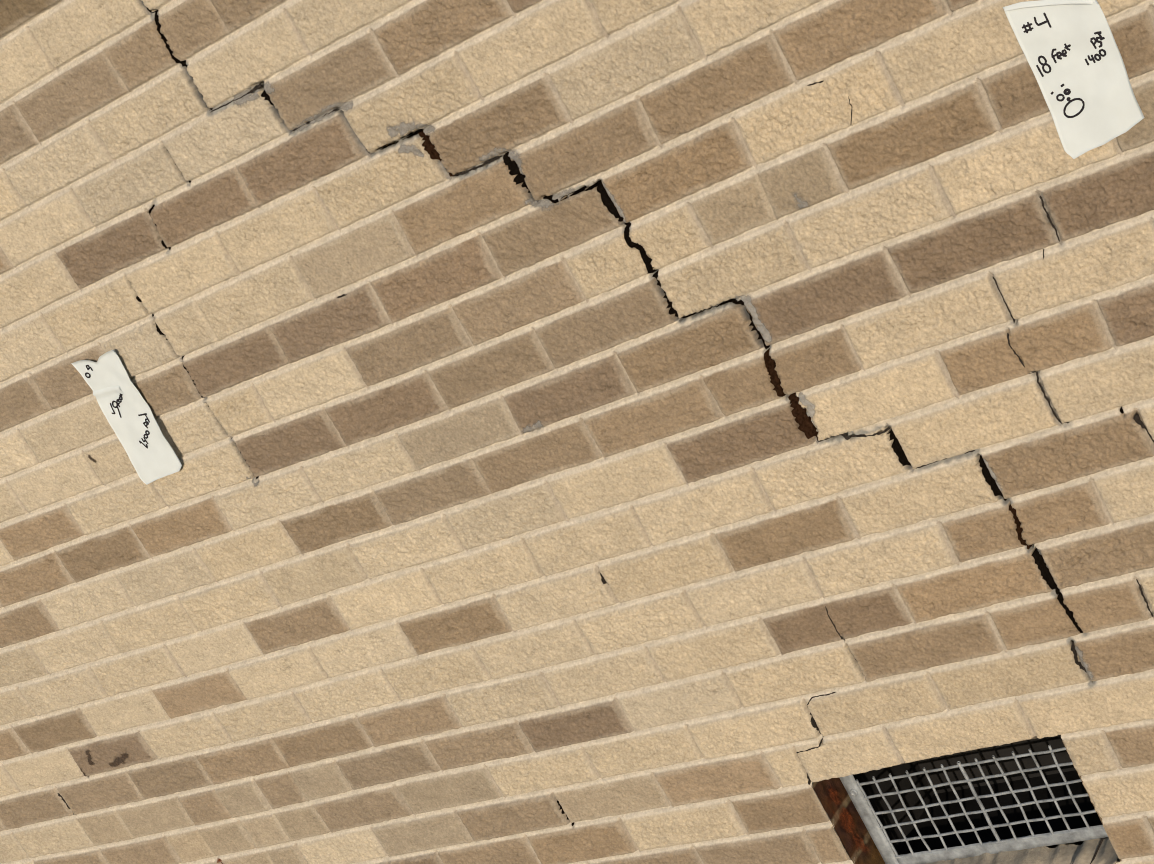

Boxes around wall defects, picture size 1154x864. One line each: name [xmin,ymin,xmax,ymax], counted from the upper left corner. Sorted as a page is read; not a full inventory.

crack [147,8,274,112]
crack [149,205,171,250]
crack [136,296,209,407]
crack [366,129,1086,672]
crack [1120,407,1154,442]
crack [796,692,836,785]